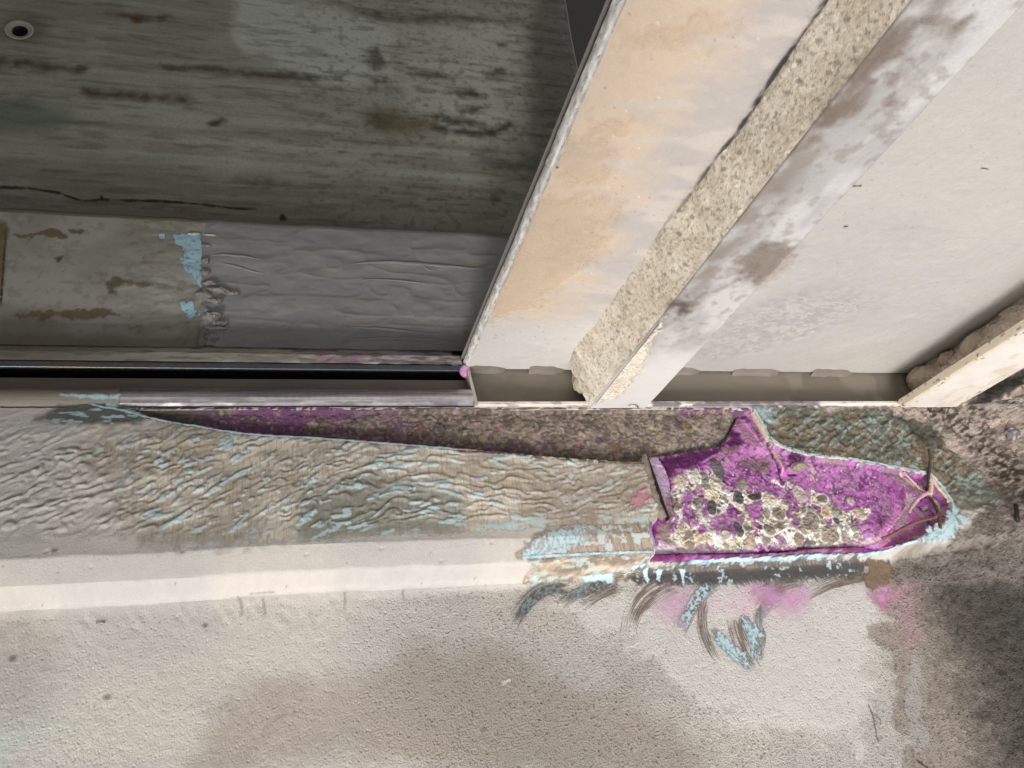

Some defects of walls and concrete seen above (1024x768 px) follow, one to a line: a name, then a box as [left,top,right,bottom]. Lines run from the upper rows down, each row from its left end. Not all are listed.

crack [0,186,249,210]
peeling [158,232,239,342]
peeling [61,394,1000,591]